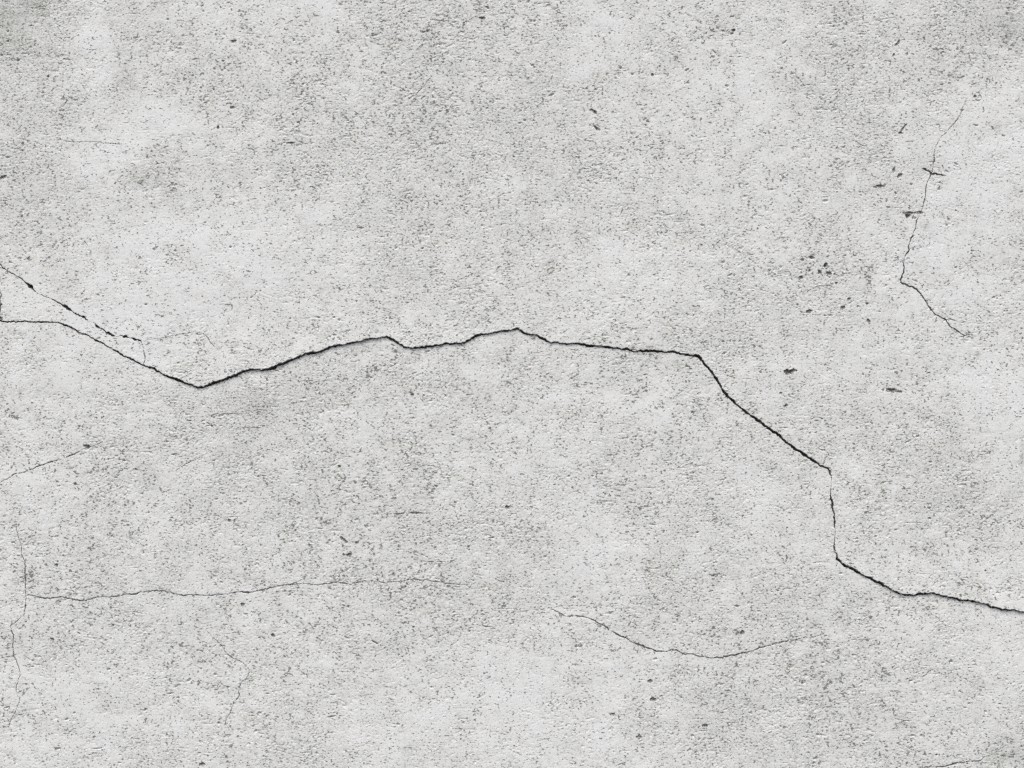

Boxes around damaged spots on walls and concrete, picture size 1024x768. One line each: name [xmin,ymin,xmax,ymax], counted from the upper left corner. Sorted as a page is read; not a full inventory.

crack [900,101,972,337]
crack [0,264,1020,612]
crack [552,609,819,658]